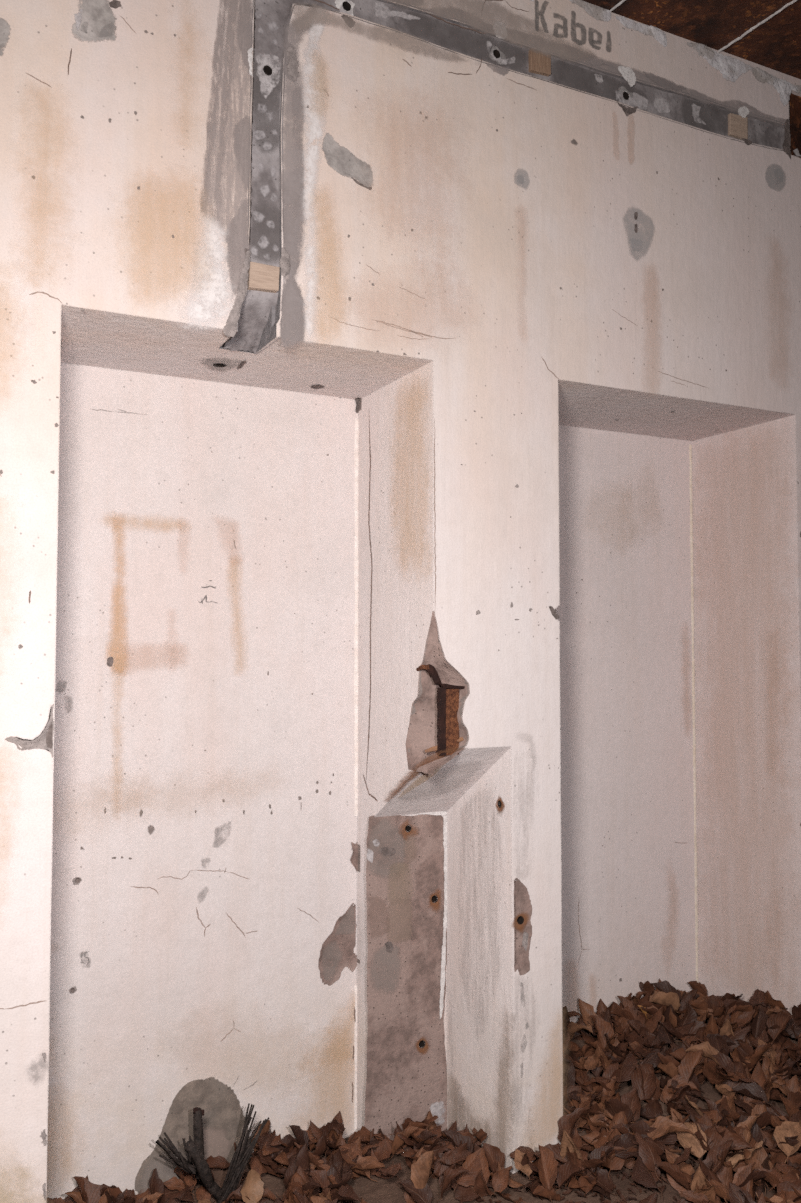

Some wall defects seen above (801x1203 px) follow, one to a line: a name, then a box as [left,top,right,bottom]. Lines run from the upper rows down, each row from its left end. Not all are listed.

spalling [0,18,11,56]
spalling [72,0,121,42]
peeling [687,42,801,190]
spalling [322,133,373,190]
spalling [624,209,653,257]
spalling [406,611,470,775]
crack [130,869,248,895]
crack [196,908,257,938]
spalling [514,878,532,975]
peeling [318,814,447,1144]